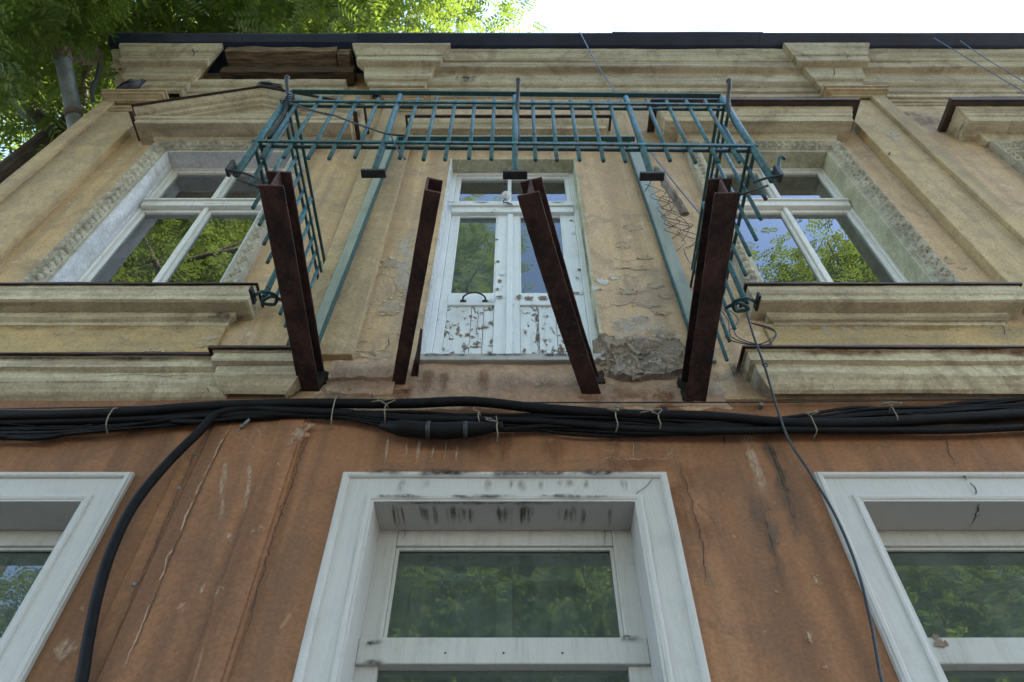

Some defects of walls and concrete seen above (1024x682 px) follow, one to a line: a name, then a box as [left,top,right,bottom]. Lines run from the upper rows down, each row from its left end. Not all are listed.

peeling [438,260,505,354]
peeling [516,294,565,354]
spalling [573,223,694,402]
crack [240,438,309,660]
crack [603,441,715,582]
water stain [743,434,796,518]
crack [947,442,981,527]